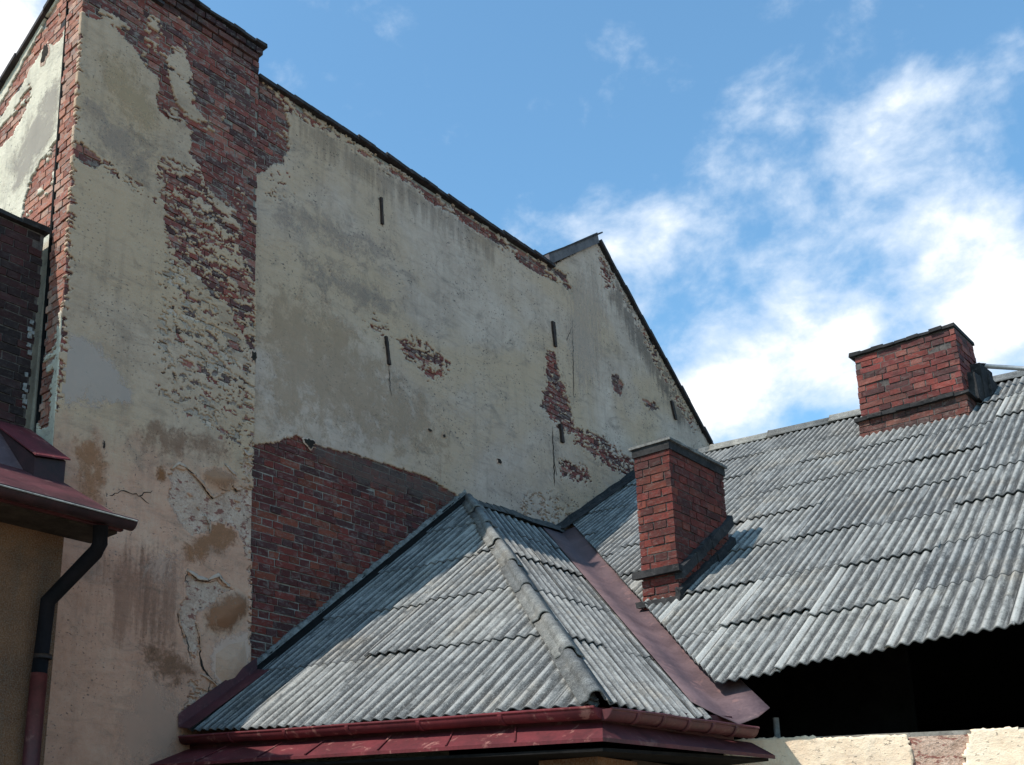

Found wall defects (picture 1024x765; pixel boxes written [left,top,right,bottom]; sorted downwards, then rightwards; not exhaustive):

flaking render [0,0,578,661]
spalling [540,350,635,486]